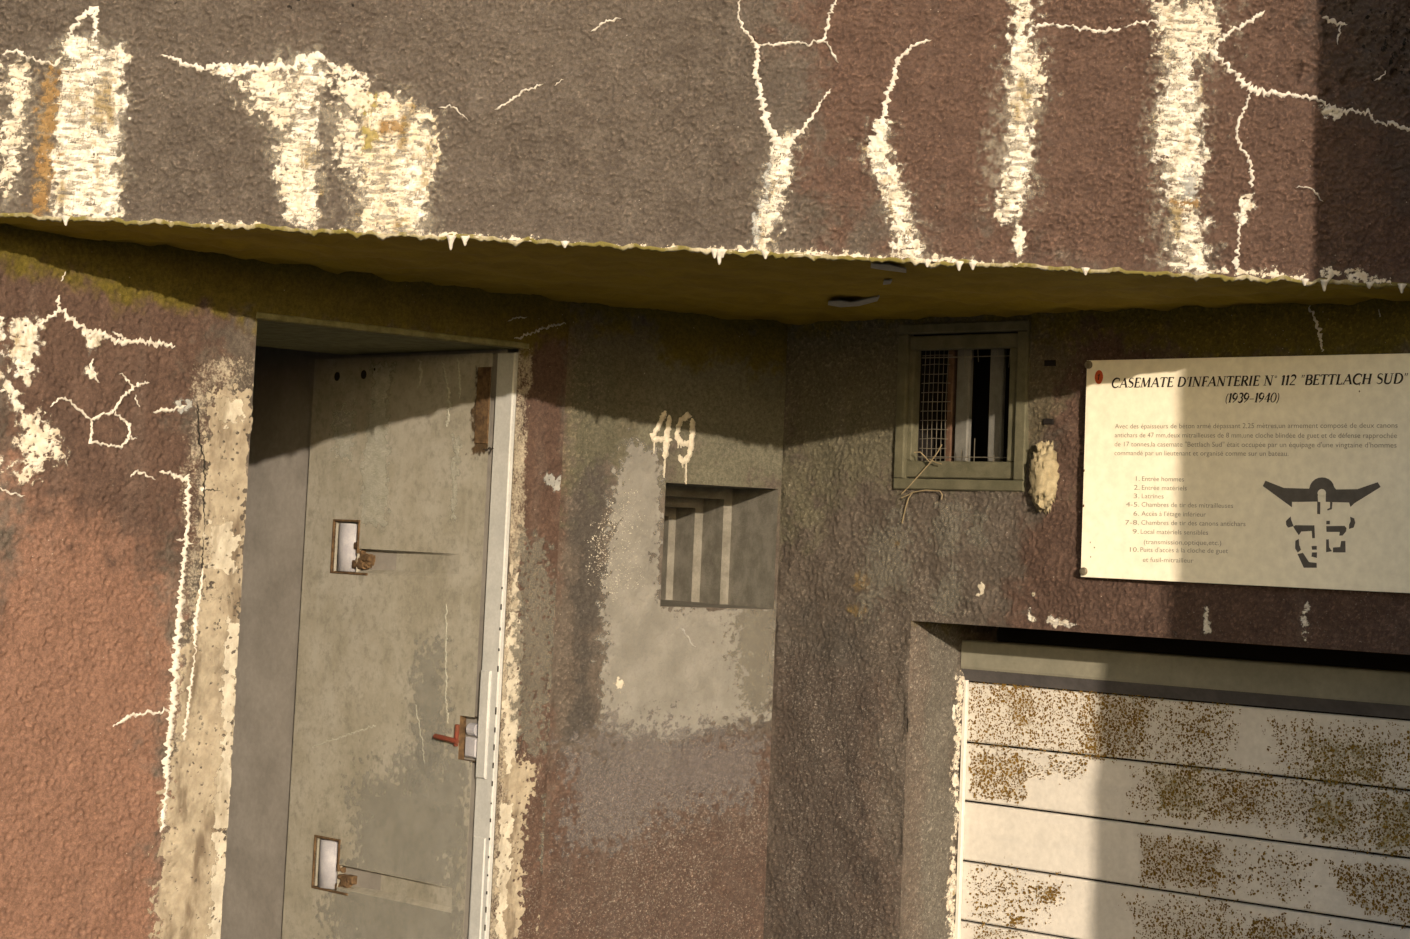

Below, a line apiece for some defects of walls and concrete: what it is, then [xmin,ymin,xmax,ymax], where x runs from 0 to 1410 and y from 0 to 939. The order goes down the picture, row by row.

damp [0,0,1410,293]
crack [737,0,839,149]
crack [867,39,931,154]
crack [1031,20,1165,34]
crack [1194,10,1410,269]
damp [0,316,70,497]
damp [82,328,110,383]
corrosion [470,368,494,456]
crack [35,272,220,832]
peeling [146,381,254,939]
damp [1028,592,1077,629]
corrosion [964,682,1410,939]